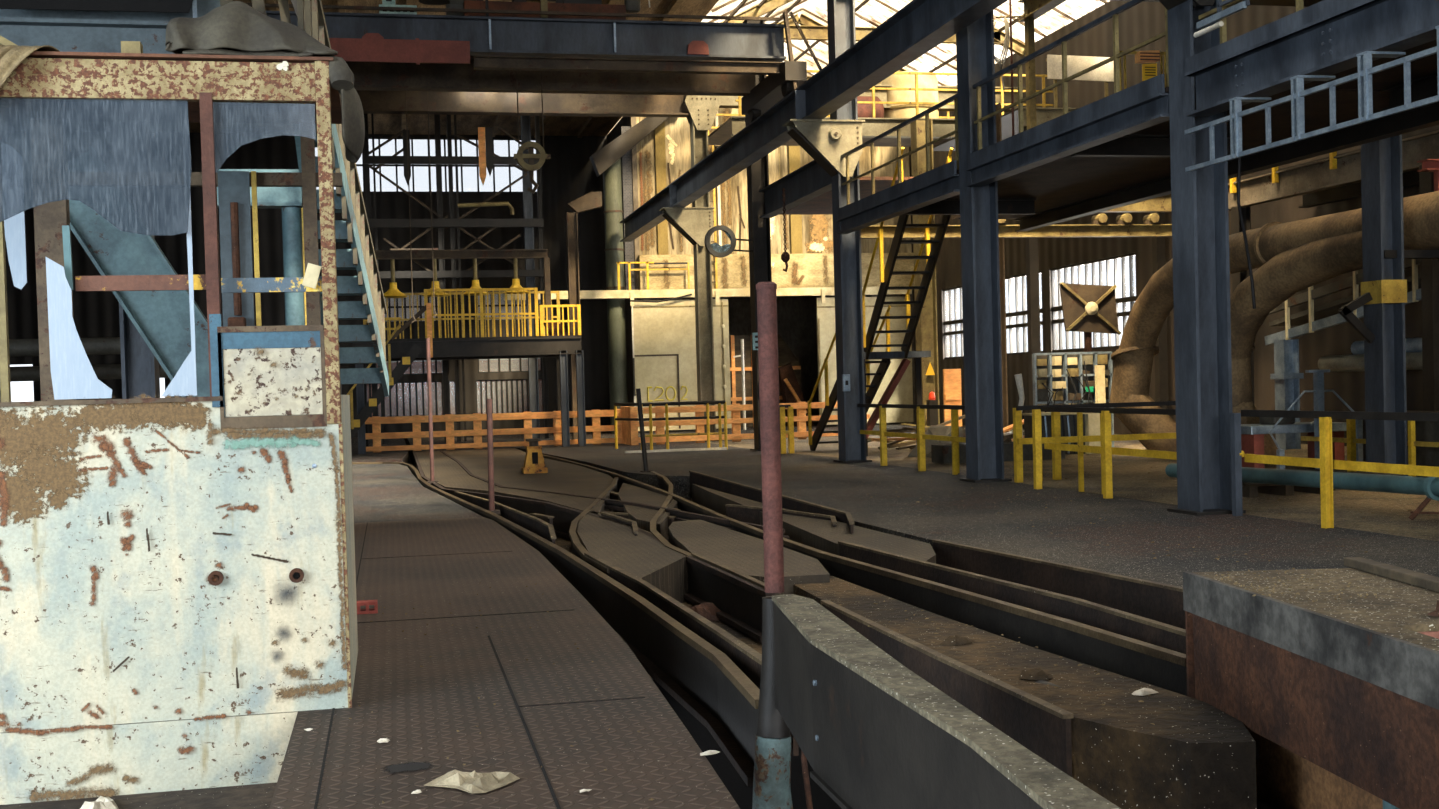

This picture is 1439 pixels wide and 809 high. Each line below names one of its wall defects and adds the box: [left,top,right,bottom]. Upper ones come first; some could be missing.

corrosion [0,471,12,592]
corrosion [78,422,348,699]
corrosion [0,703,113,736]
corrosion [175,708,226,754]
corrosion [29,763,138,802]